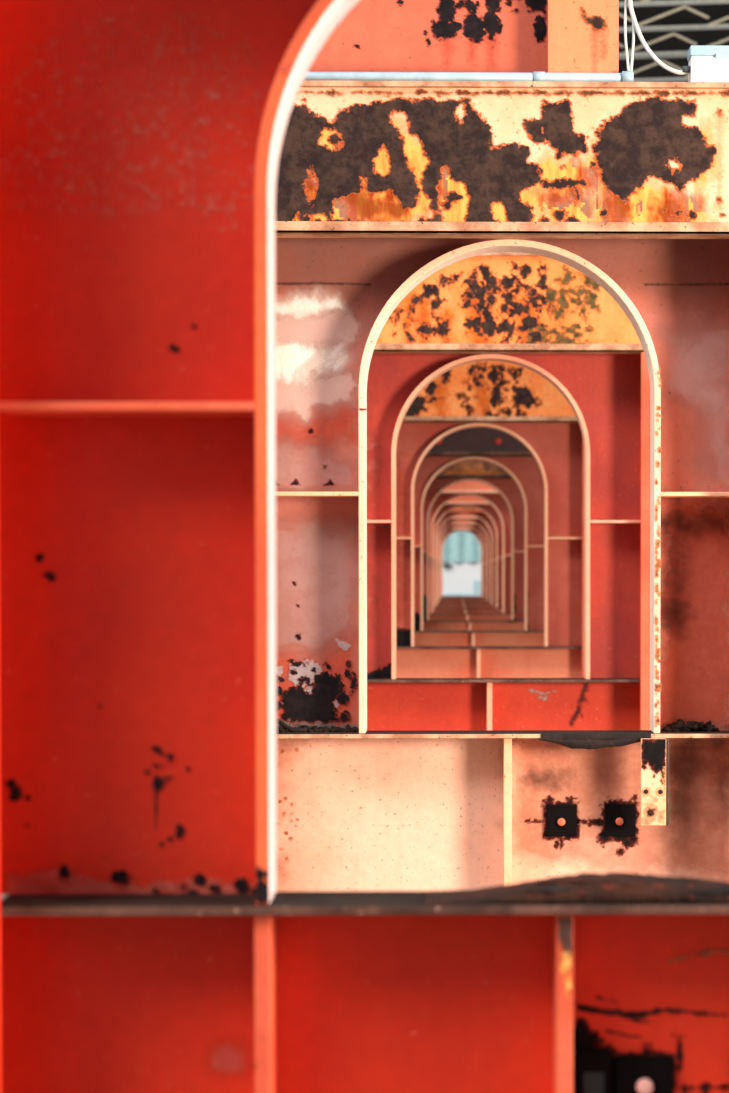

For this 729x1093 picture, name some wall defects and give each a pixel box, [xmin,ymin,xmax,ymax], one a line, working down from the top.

corrosion [580,7,608,31]
corrosion [275,89,729,222]
corrosion [387,257,561,344]
corrosion [405,362,543,416]
peeling [276,638,359,728]
corrosion [143,745,185,846]